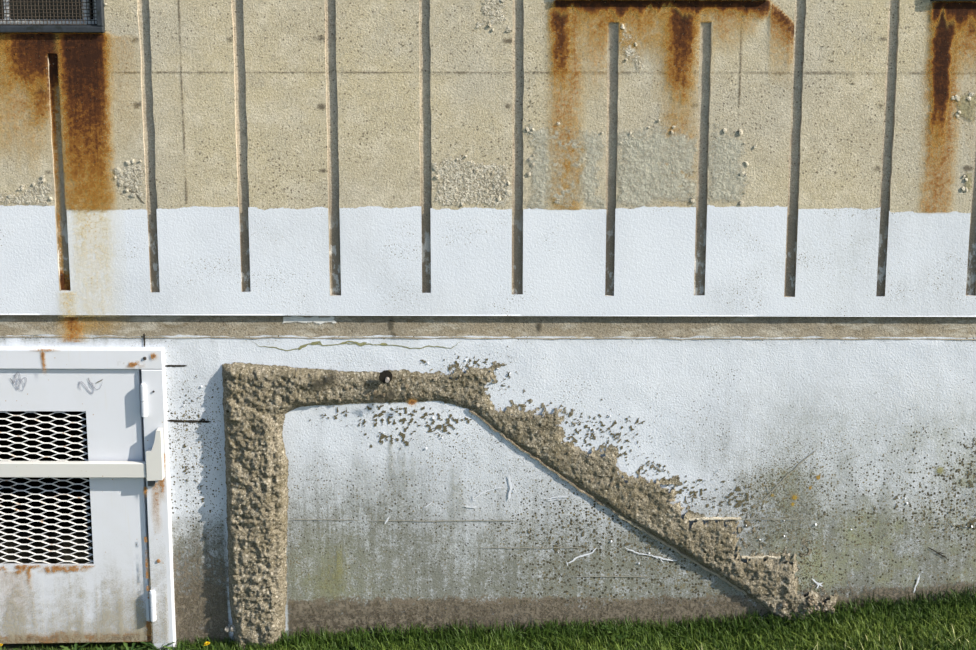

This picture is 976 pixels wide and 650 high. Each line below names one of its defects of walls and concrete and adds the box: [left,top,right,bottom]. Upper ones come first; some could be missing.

corrosion [549,0,794,208]
corrosion [922,1,976,213]
corrosion [0,33,113,298]
corrosion [63,311,96,342]
crack [255,341,458,351]
corrosion [0,565,94,581]
damp [803,581,976,611]
corrosion [0,621,153,644]
damp [290,595,747,642]